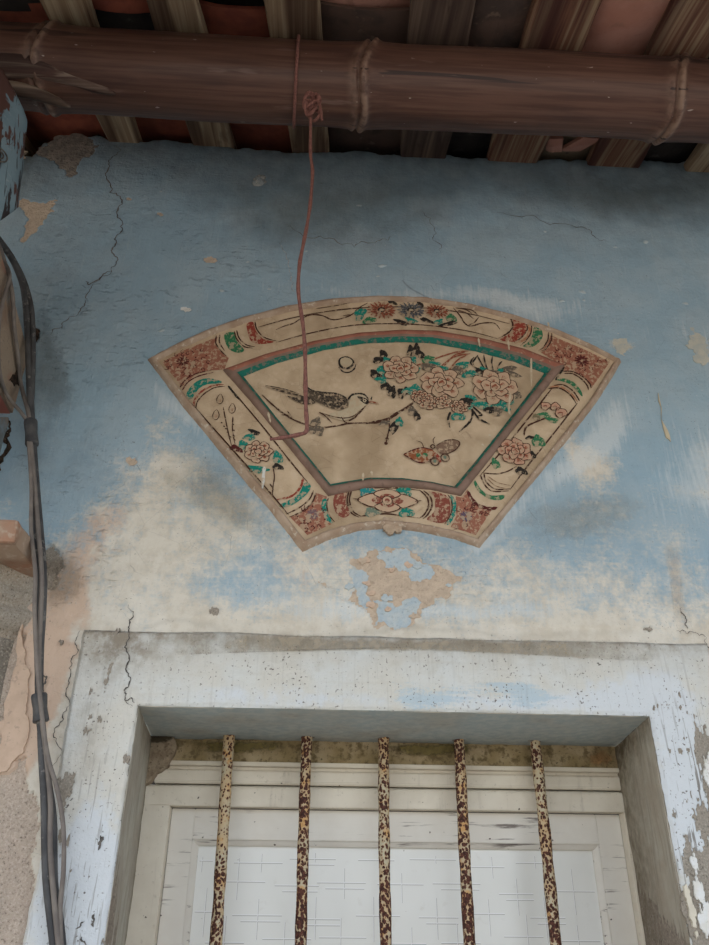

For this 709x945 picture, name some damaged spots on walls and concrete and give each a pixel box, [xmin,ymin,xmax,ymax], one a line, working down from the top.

peeling [24,133,99,177]
peeling [19,199,58,243]
crack [51,146,123,334]
peeling [318,546,462,630]
crack [124,611,135,706]
spalling [0,624,41,945]
peeling [57,771,76,811]
peeling [668,691,709,945]